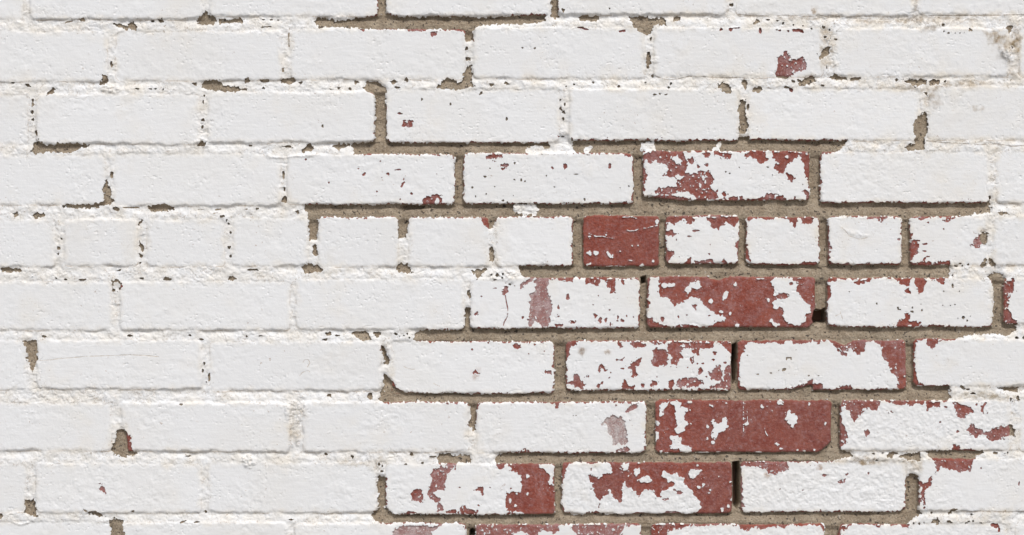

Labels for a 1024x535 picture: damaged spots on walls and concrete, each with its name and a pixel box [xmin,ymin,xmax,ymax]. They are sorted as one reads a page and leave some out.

peeling [753,19,861,92]
spalling [192,68,303,104]
spalling [12,82,90,155]
spalling [63,172,175,226]
peeling [281,77,1024,535]
spalling [22,335,47,371]
spalling [111,429,138,458]